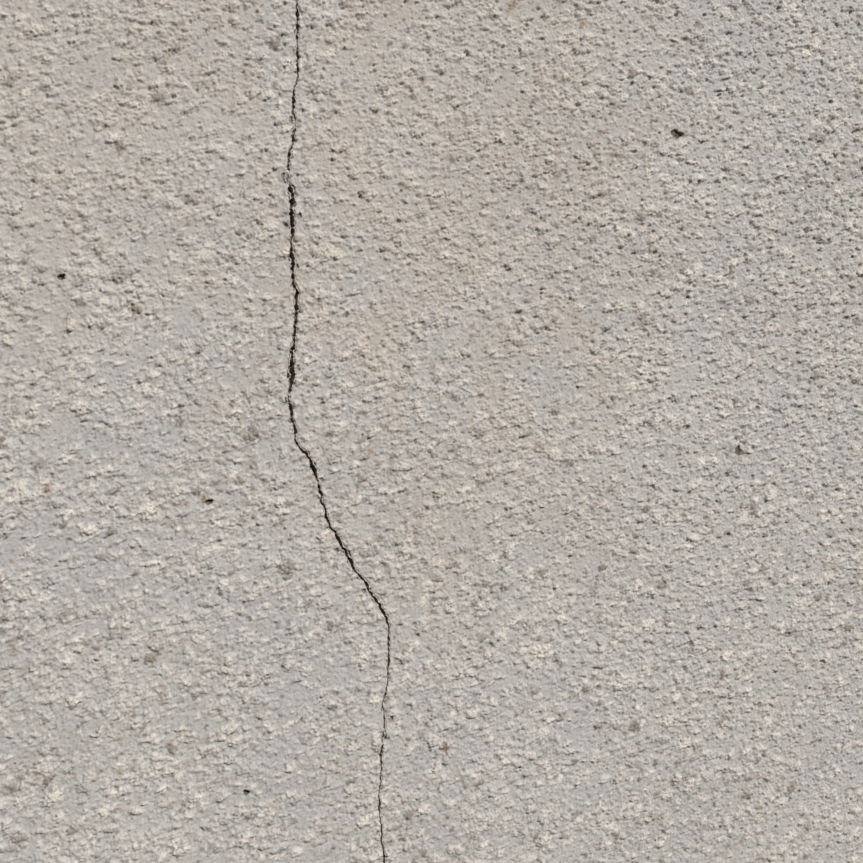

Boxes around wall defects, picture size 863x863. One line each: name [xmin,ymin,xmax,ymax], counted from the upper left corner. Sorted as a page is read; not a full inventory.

crack [279,0,394,863]